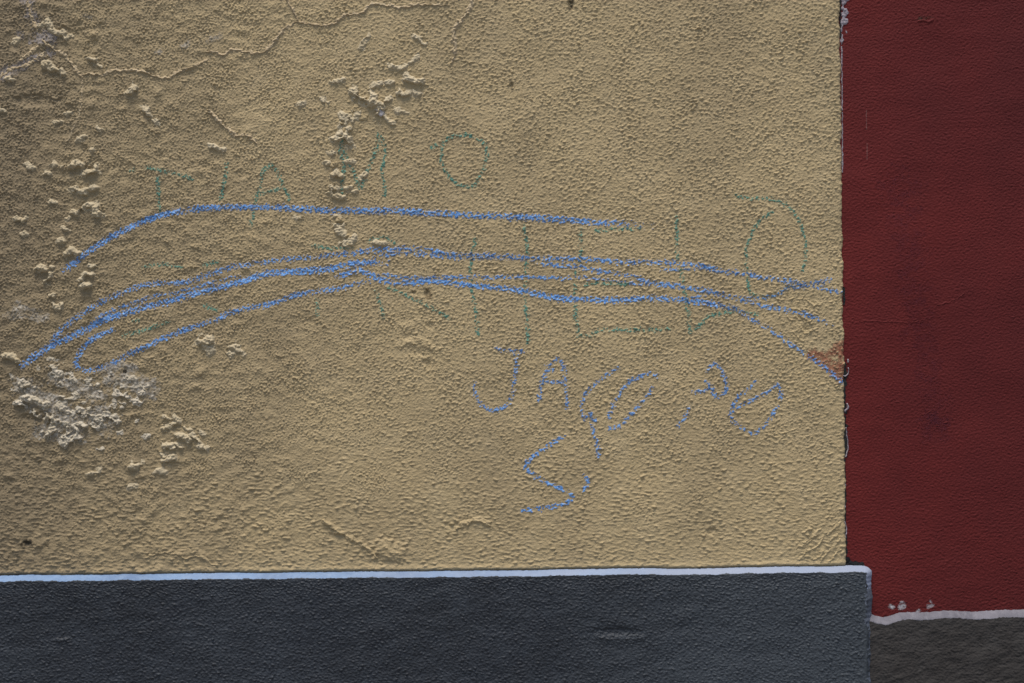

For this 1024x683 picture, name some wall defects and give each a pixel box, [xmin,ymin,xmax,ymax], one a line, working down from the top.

spalling [1,352,160,451]